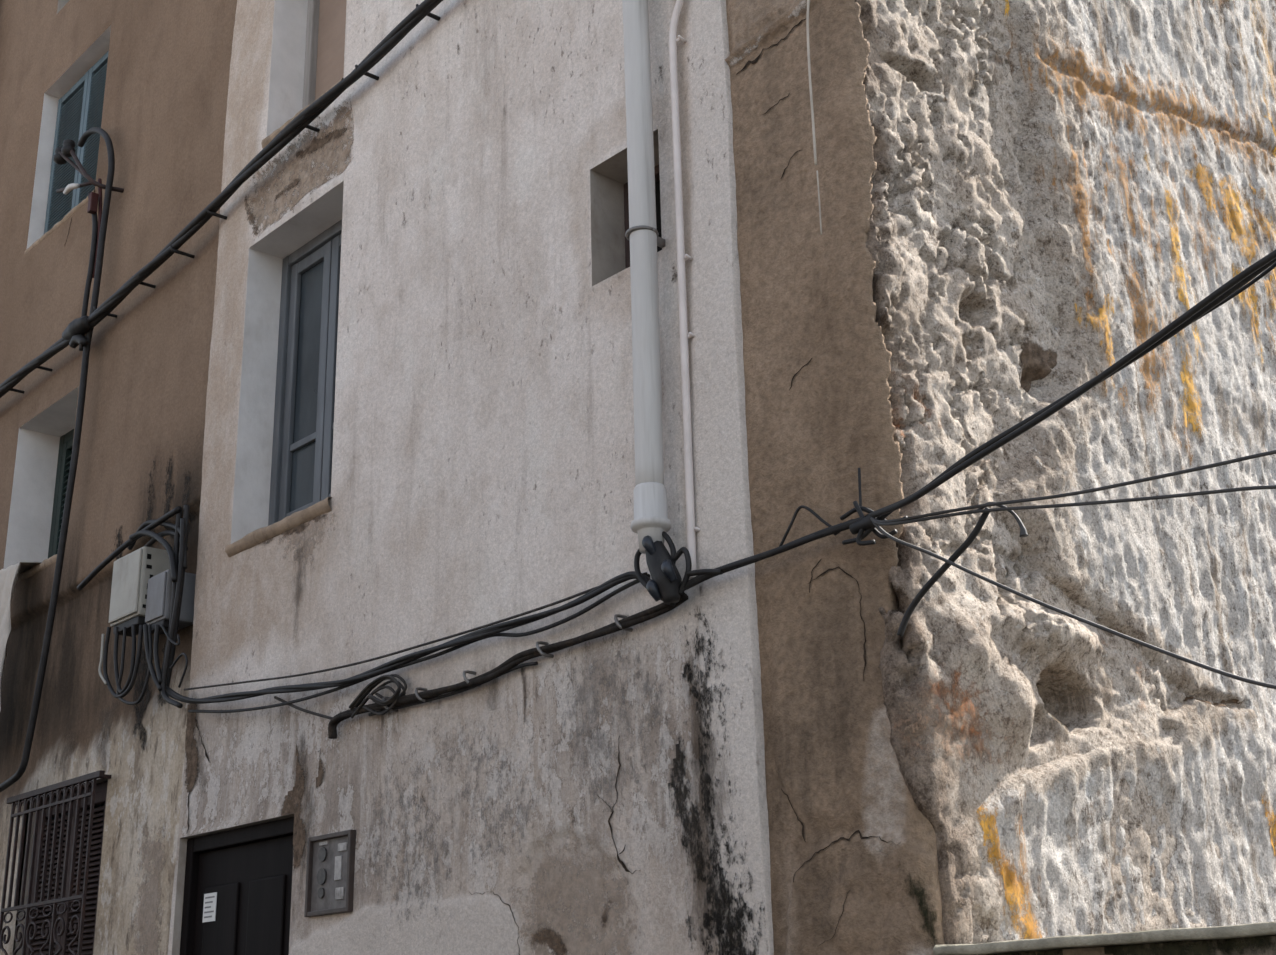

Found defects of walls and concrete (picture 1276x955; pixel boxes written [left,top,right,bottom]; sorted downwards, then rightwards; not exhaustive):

peeling [244,96,354,237]
spalling [854,0,1276,944]
leakage [132,642,166,752]
peeling [471,840,637,955]
crack [597,735,638,874]
leakage [668,607,765,955]
crack [782,790,900,882]